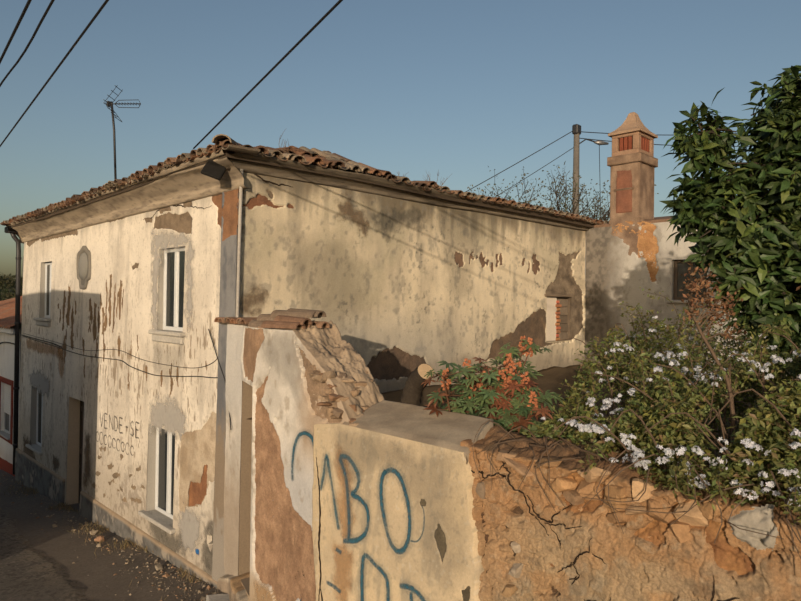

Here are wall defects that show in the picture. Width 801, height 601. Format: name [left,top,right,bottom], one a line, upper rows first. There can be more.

peeling [144,202,193,234]
spalling [212,189,294,244]
crack [254,174,291,187]
spalling [486,250,583,361]
spalling [299,347,342,423]
spalling [179,412,216,513]
spalling [243,326,316,601]
spalling [434,524,447,562]
crack [471,441,606,589]
crack [711,575,740,601]